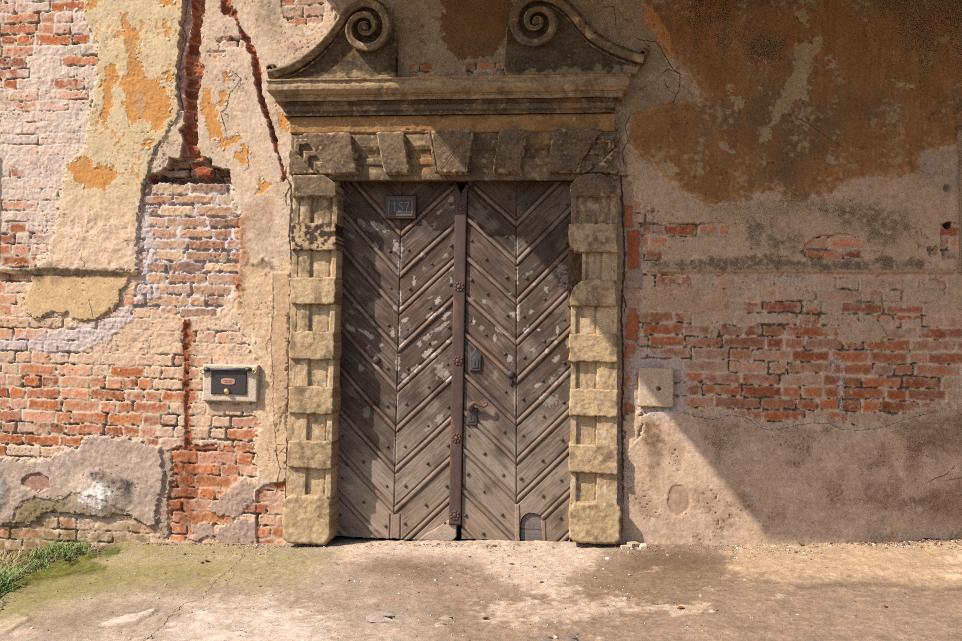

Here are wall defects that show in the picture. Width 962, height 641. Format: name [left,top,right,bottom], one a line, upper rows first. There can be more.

spalling [63,0,99,13]
spalling [0,33,78,109]
peeling [99,13,175,150]
spalling [201,33,251,67]
peeling [200,70,252,165]
peeling [66,155,118,192]
spalling [149,158,232,186]
spalling [0,217,48,266]
spalling [624,206,729,271]
spalling [625,307,962,430]
spalling [0,354,286,544]
water stain [78,472,128,512]